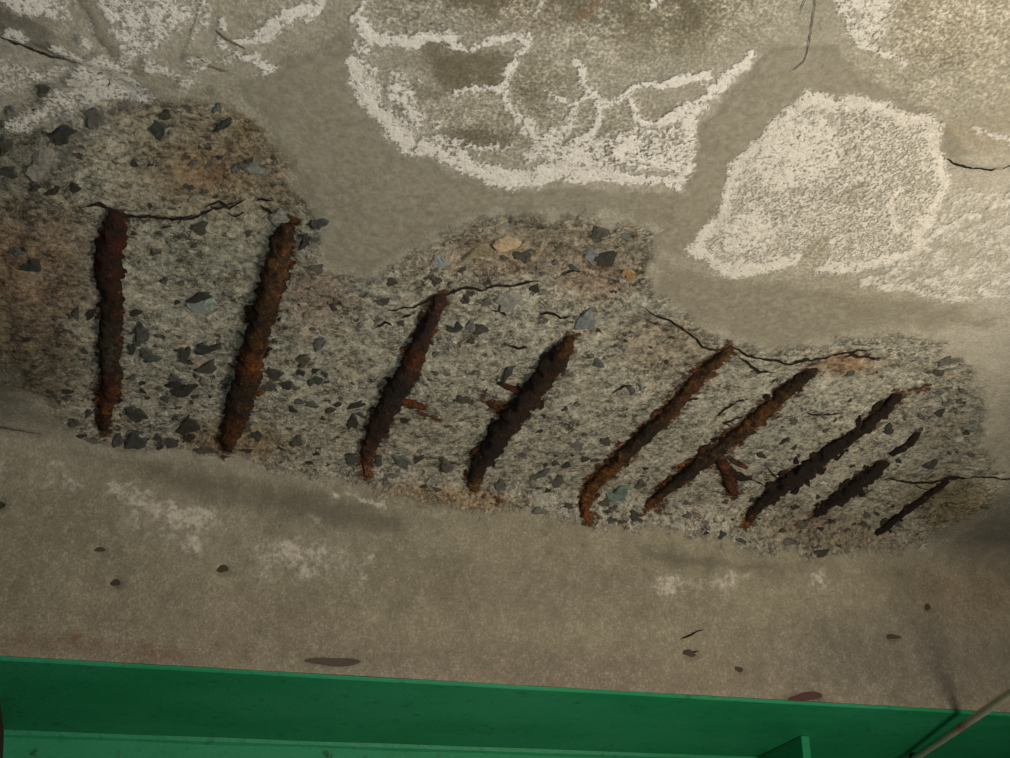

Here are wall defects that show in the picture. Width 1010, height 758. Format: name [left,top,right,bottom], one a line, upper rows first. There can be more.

crack [0,31,74,63]
crack [80,0,147,77]
water stain [0,0,1010,342]
crack [942,155,1010,171]
spalling [0,69,1010,564]
rust [215,296,257,461]
rust [405,396,444,422]
rust [576,340,737,527]
rust [639,363,820,532]
rust [876,383,932,427]
rust [463,474,506,507]